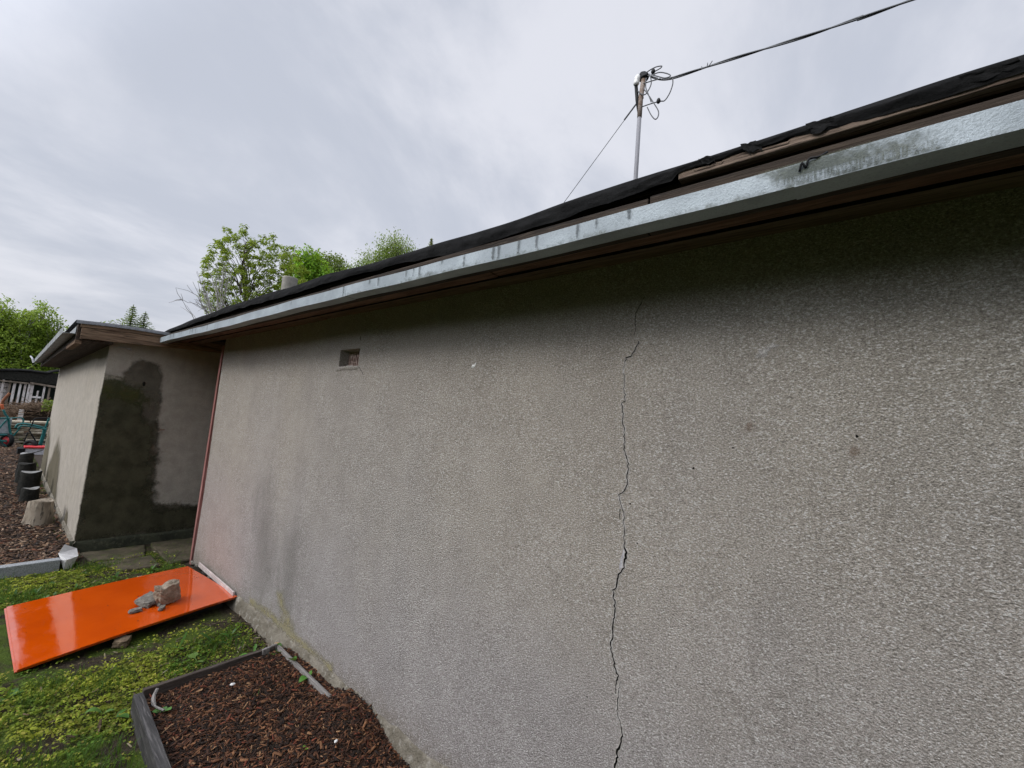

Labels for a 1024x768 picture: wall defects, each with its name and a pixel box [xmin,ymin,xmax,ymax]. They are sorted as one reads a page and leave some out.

leakage [64,360,198,542]
crack [609,298,644,768]